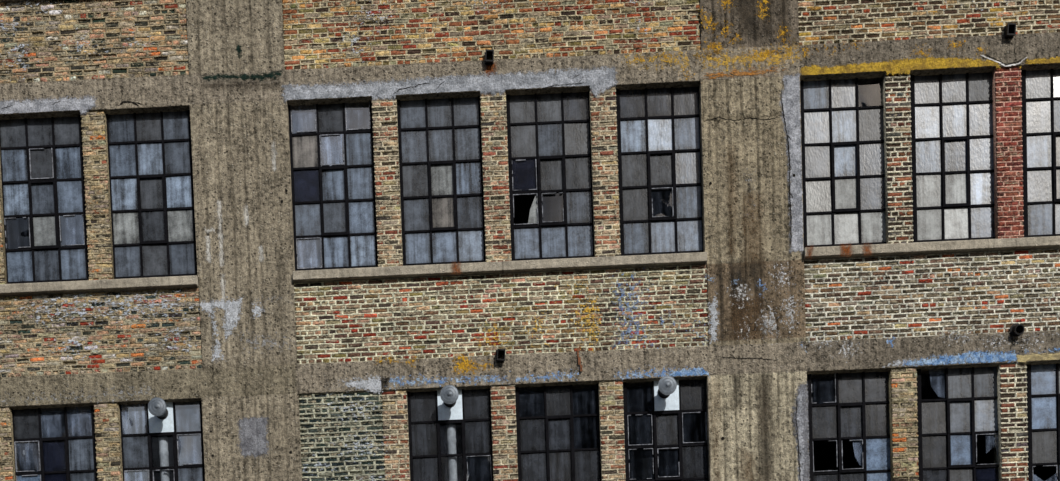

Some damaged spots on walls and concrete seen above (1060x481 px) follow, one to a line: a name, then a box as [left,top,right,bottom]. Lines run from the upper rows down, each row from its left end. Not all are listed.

peeling [199,296,295,362]
peeling [614,366,675,380]
leakage [721,259,763,337]
flaking render [940,326,1060,362]